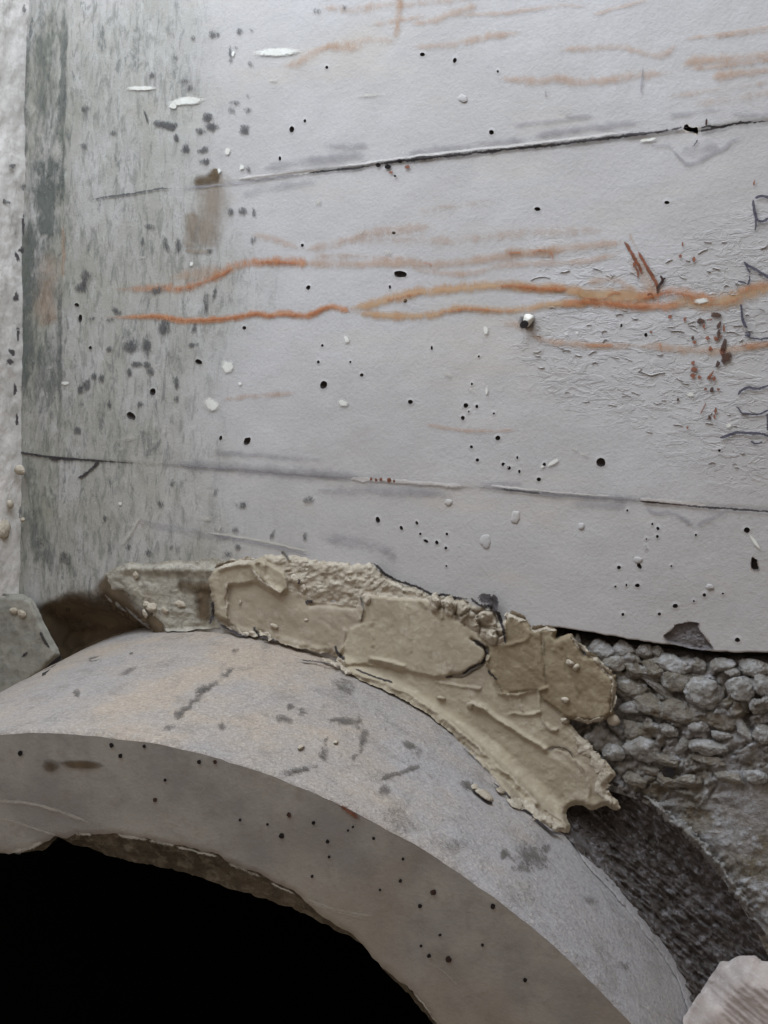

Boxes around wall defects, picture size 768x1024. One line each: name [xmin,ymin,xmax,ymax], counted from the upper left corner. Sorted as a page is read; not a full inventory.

crack [93,119,765,200]
water stain [195,169,219,185]
rust [142,258,305,291]
rust [128,281,768,420]
crack [21,452,132,478]
crack [181,465,289,475]
crack [318,476,462,488]
crack [487,484,768,513]
spalling [554,622,768,954]